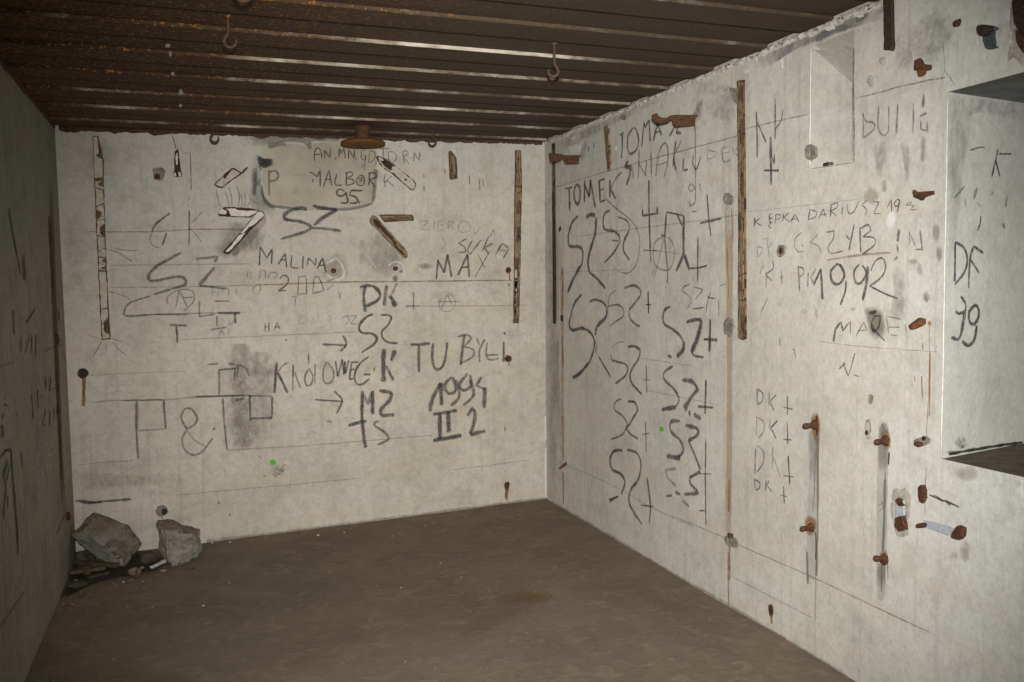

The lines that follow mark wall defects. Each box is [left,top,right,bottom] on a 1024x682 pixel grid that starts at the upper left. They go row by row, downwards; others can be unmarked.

rust [921,321,931,436]